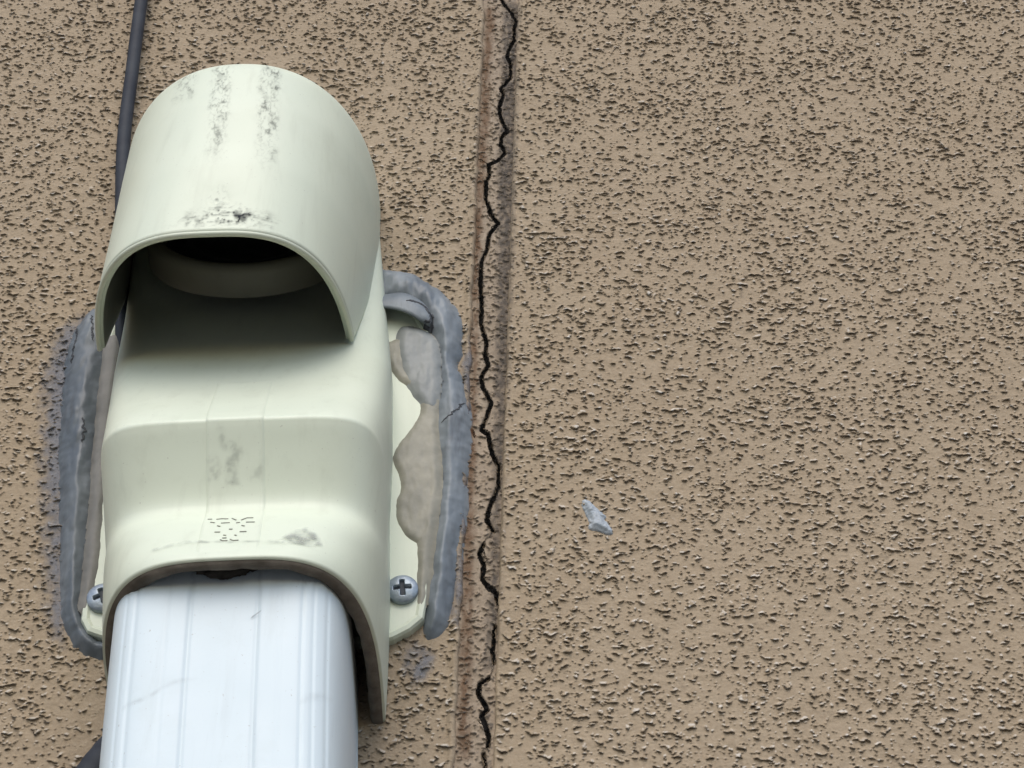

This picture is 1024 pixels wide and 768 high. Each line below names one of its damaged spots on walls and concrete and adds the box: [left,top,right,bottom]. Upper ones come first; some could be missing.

crack [476,0,518,768]